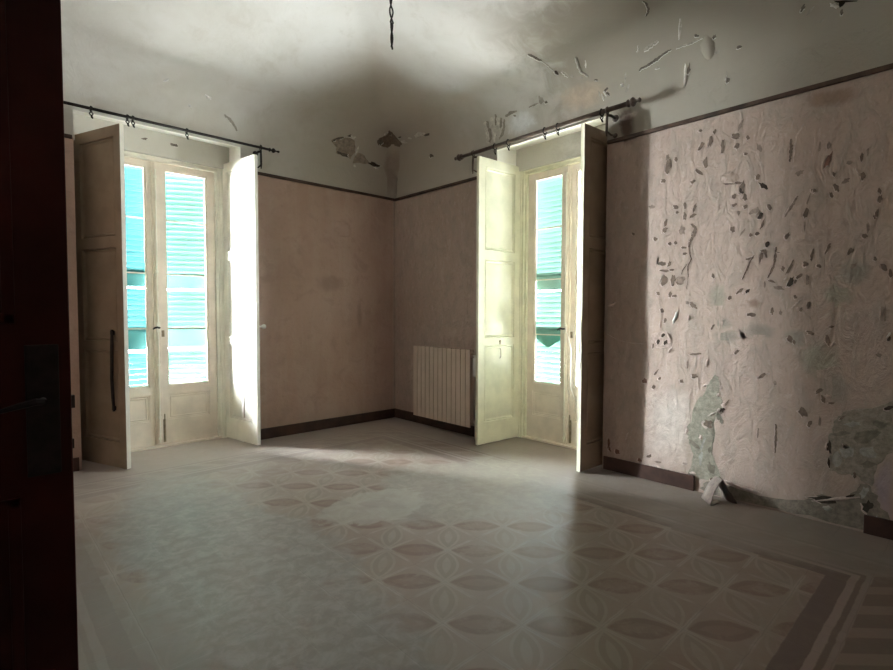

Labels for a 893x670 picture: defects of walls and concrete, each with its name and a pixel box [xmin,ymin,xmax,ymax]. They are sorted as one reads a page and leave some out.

spalling [331,134,381,170]
peeling [660,154,678,183]
peeling [689,119,762,185]
peeling [818,142,869,198]
peeling [652,205,679,246]
peeling [729,174,772,263]
spalling [650,257,697,353]
peeling [764,243,831,312]
spalling [678,353,893,530]